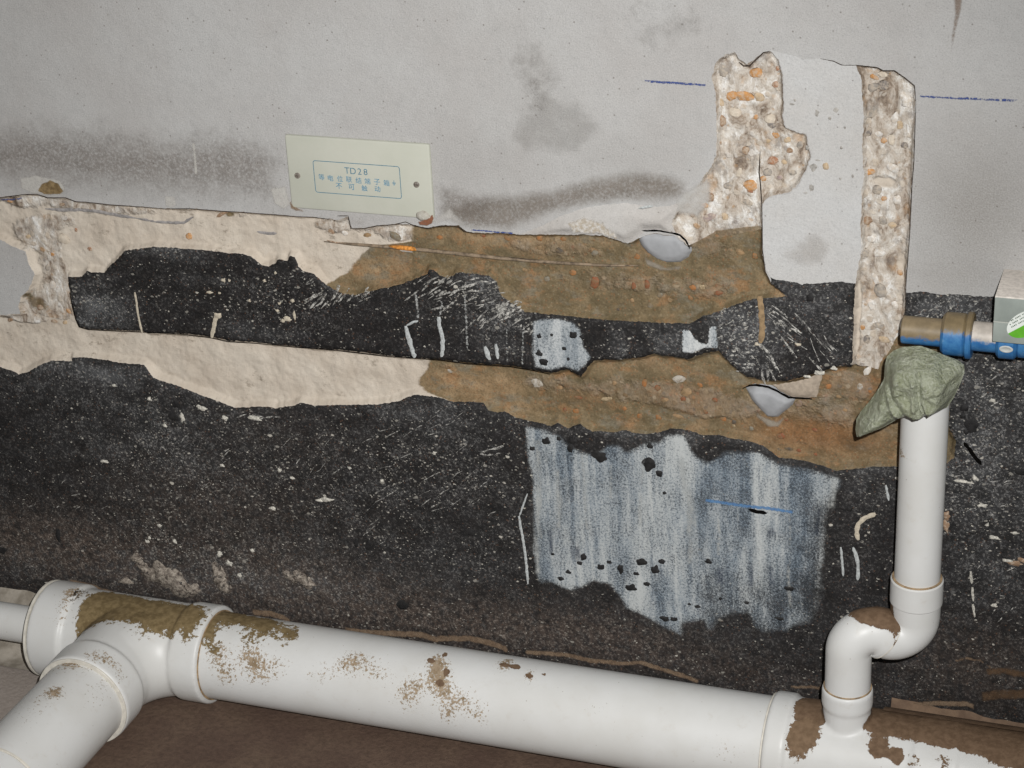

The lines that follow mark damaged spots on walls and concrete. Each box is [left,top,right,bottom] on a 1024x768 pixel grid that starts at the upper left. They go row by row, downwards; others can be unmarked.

spalling [324,240,640,267]
damp [438,179,709,224]
flaking render [672,51,916,376]
damp [525,427,839,634]